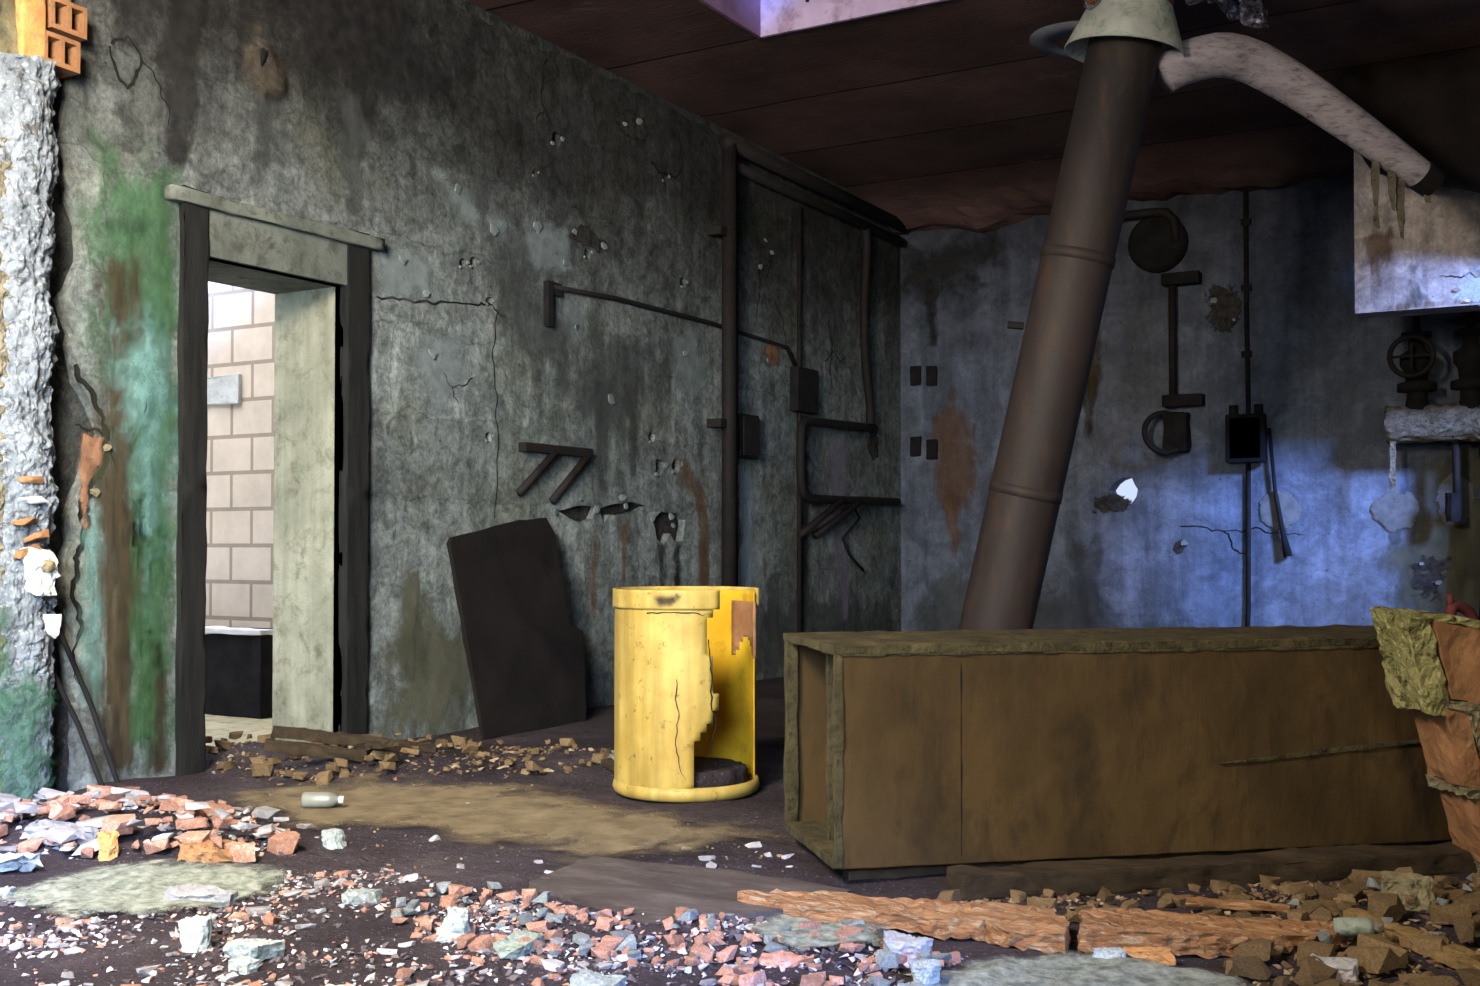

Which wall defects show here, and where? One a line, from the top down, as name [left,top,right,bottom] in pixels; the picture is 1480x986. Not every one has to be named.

crack [109,35,170,123]
crack [70,364,113,684]
leakage [83,261,168,775]